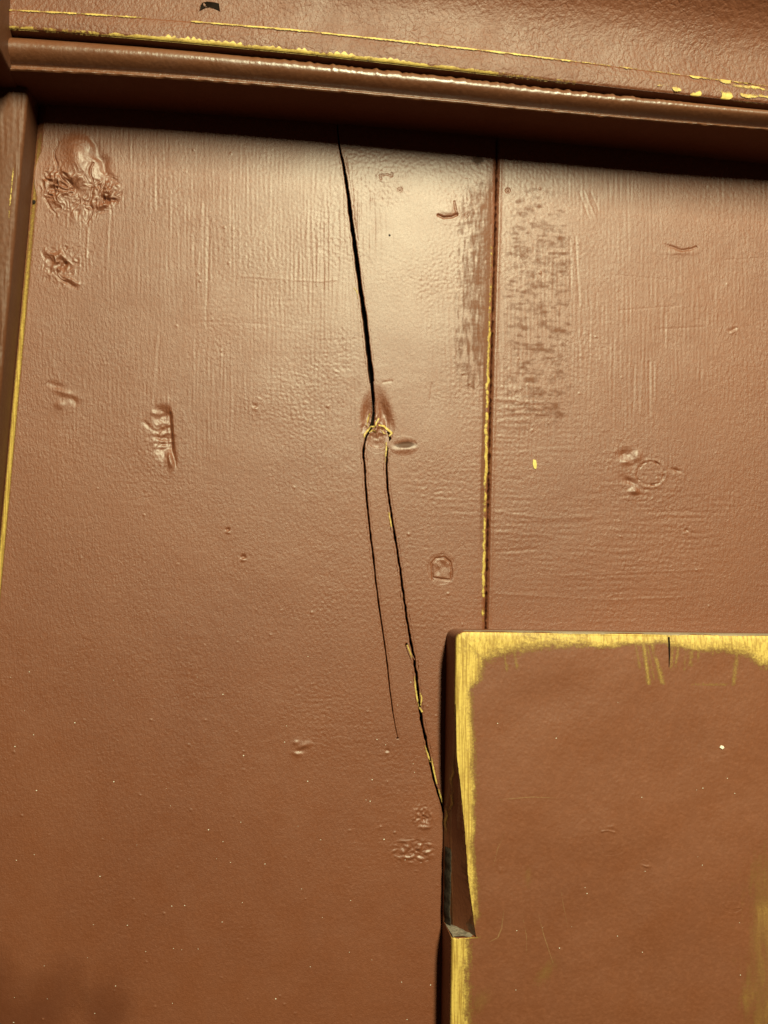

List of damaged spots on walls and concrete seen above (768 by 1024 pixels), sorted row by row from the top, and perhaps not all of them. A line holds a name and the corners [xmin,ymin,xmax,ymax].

peeling [191,1,632,69]
peeling [651,70,768,104]
crack [335,125,444,824]